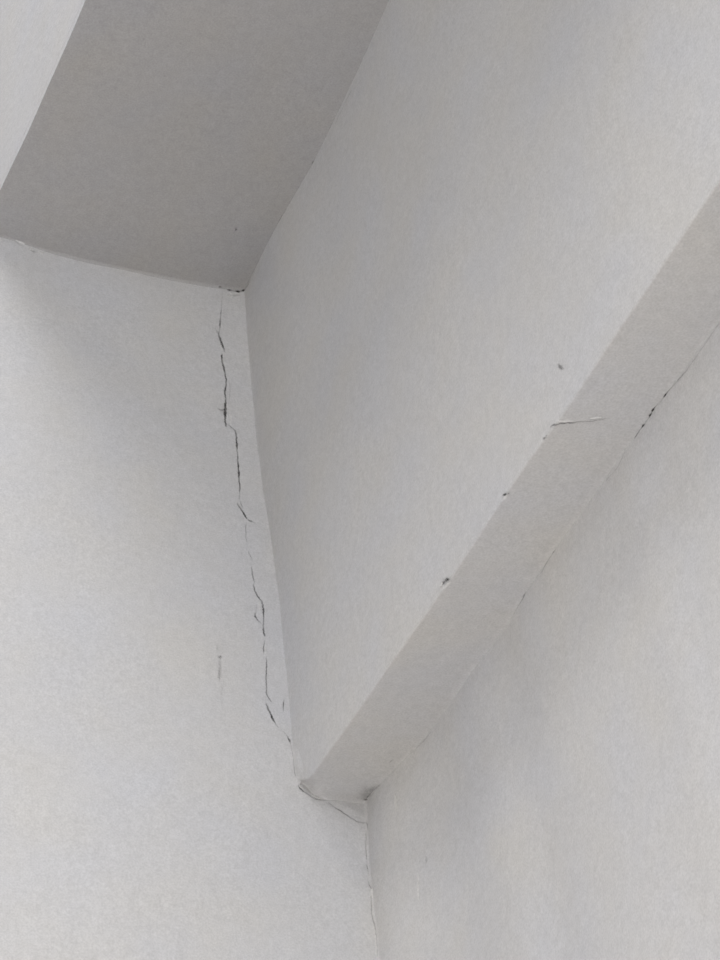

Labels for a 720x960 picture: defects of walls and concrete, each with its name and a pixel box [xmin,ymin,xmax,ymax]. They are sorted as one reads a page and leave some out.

crack [219,340,246,517]